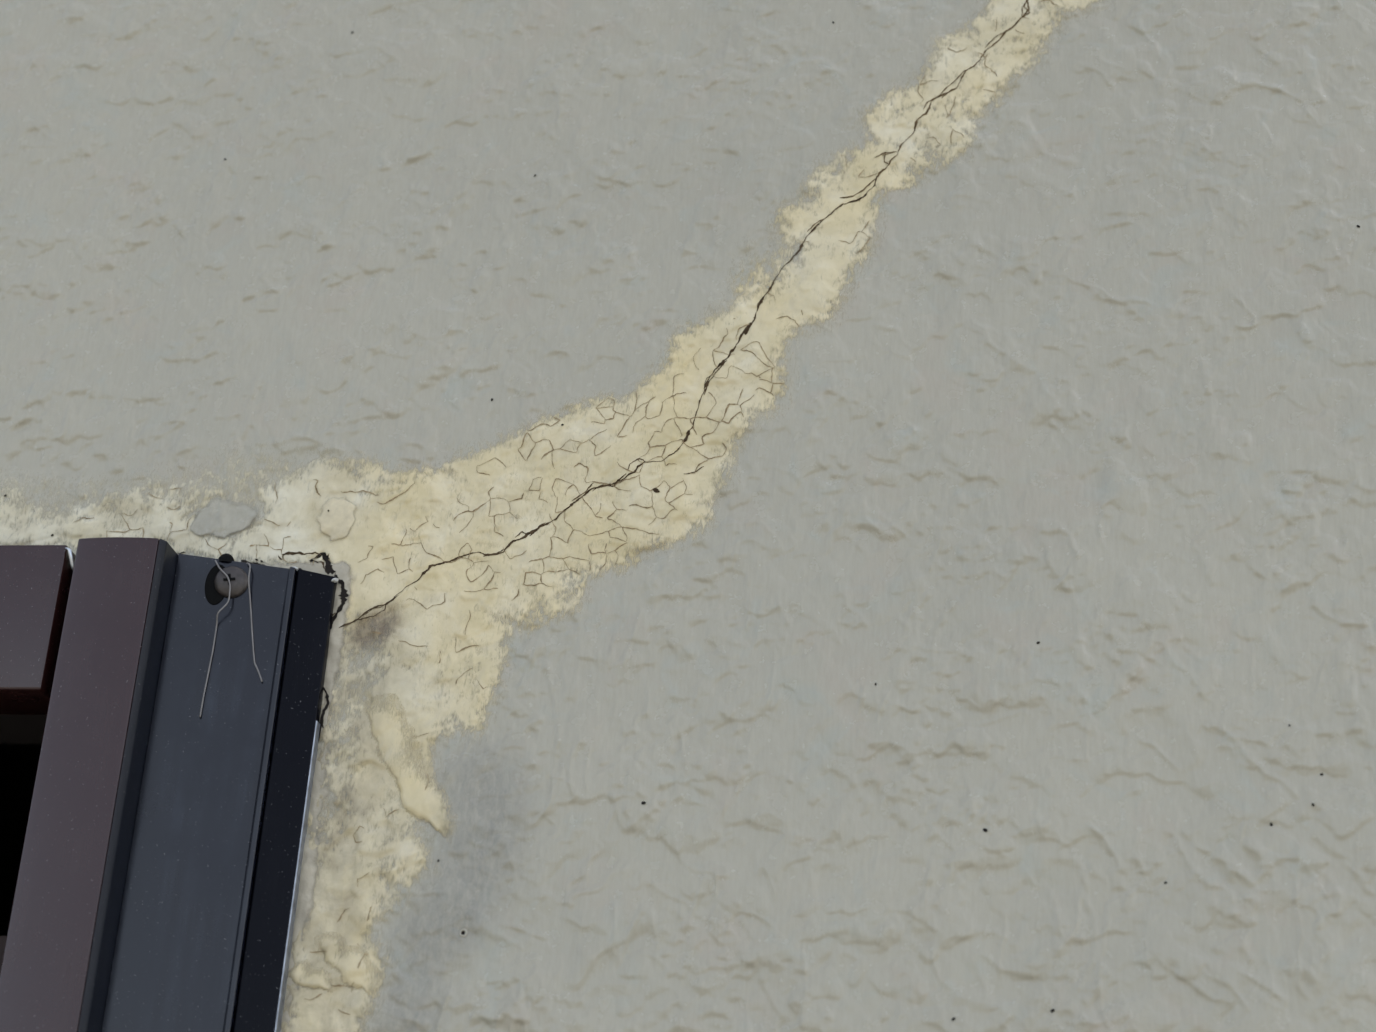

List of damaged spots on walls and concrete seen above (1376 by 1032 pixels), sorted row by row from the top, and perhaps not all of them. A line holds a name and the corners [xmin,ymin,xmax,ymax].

crack [73,0,1058,689]
crack [307,808,399,1015]